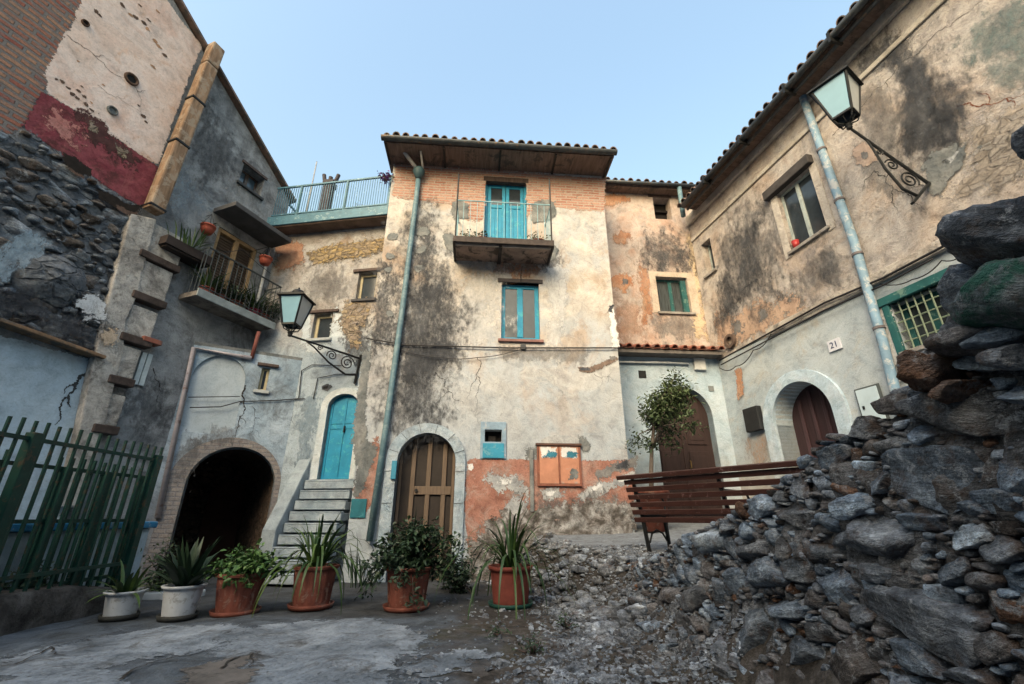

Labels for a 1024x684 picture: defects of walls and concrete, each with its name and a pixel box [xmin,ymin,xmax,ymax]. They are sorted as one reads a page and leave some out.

spalling [120,2,167,57]
leakage [953,0,1024,88]
flaking render [0,0,148,179]
leakage [857,27,980,210]
crack [963,93,1023,107]
peeling [611,272,635,294]
leakage [713,200,784,331]
peeling [75,290,121,346]
leakage [342,201,473,436]
crack [55,373,85,425]
crack [235,385,263,438]
peeling [468,455,639,519]